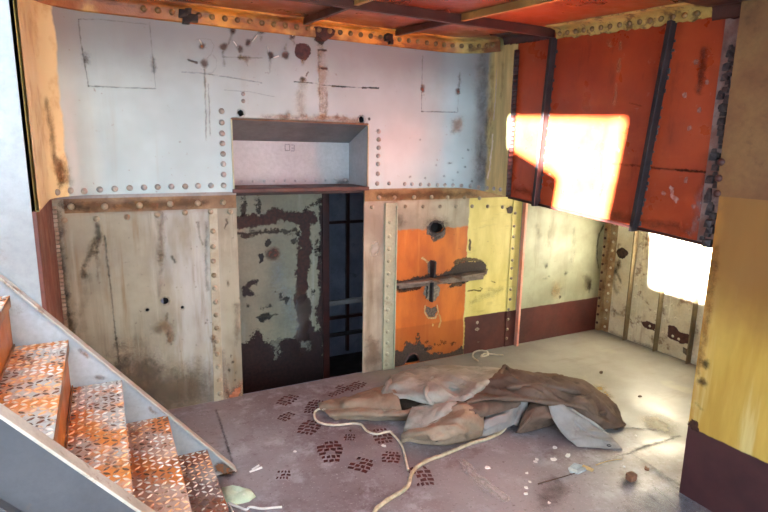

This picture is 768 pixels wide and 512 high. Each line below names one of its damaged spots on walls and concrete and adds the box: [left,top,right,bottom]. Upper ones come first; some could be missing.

corrosion [267,26,336,61]
corrosion [48,118,66,183]
peeling [237,195,323,394]
peeling [395,333,463,367]
peeling [667,325,689,355]
leakage [117,364,203,407]